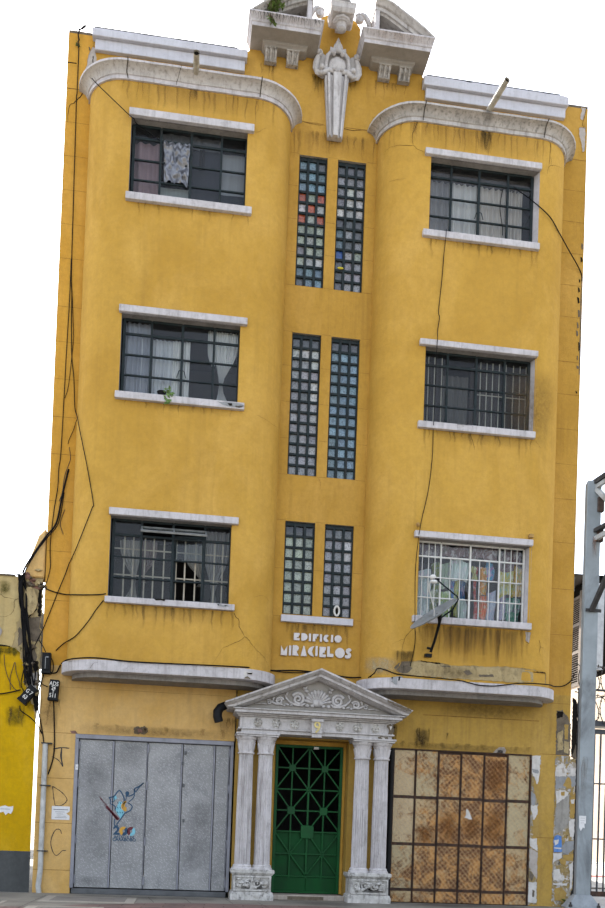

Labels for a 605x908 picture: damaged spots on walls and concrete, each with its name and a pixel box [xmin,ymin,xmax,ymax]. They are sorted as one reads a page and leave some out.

spalling [0,577,44,720]
peeling [527,755,541,905]
peeling [551,698,578,906]